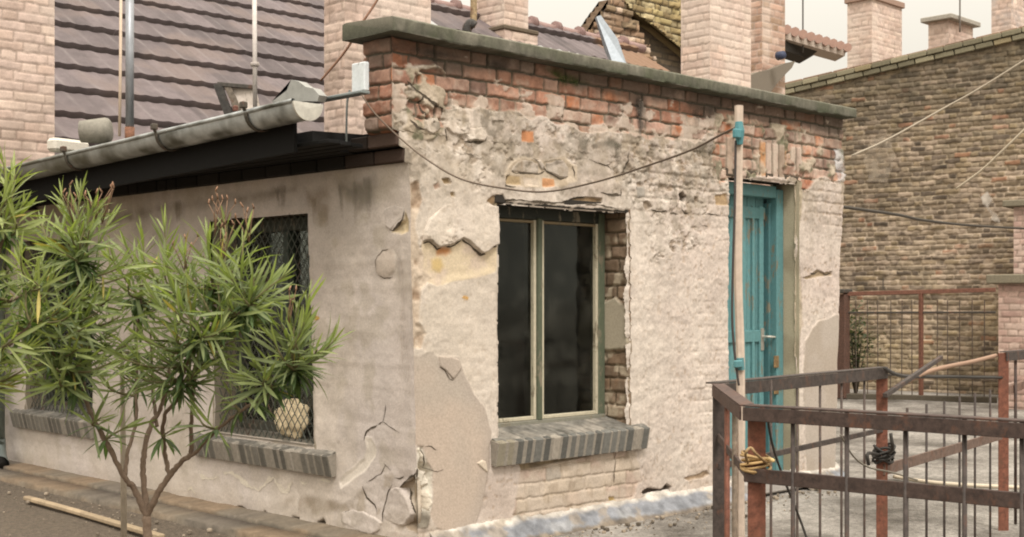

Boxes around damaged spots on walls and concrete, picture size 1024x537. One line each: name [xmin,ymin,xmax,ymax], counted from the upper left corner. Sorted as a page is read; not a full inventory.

flaking render [363,35,844,357]
crack [364,405,396,438]
crack [341,446,441,522]
spalling [513,450,671,517]